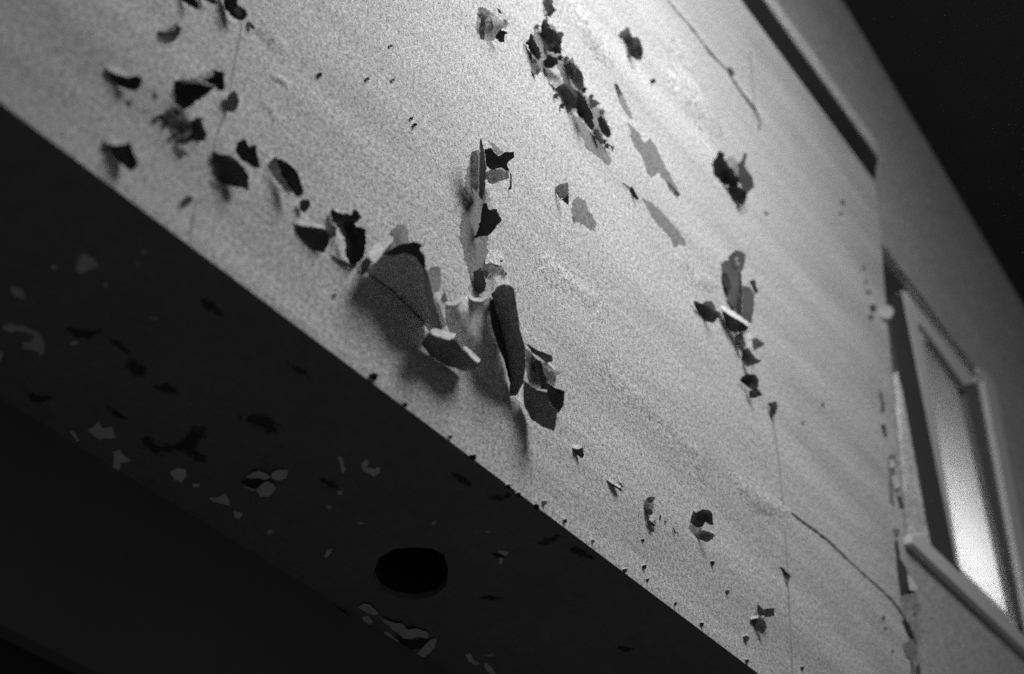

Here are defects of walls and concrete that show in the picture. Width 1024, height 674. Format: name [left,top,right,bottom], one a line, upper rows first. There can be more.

peeling [103,136,138,171]
peeling [106,66,143,91]
peeling [157,69,239,156]
peeling [477,7,509,43]
peeling [526,0,615,166]
peeling [620,27,643,61]
crack [668,0,761,130]
peeling [712,150,754,205]
peeling [209,139,565,431]
peeling [693,250,777,416]
peeling [641,497,715,542]
crack [771,416,909,674]